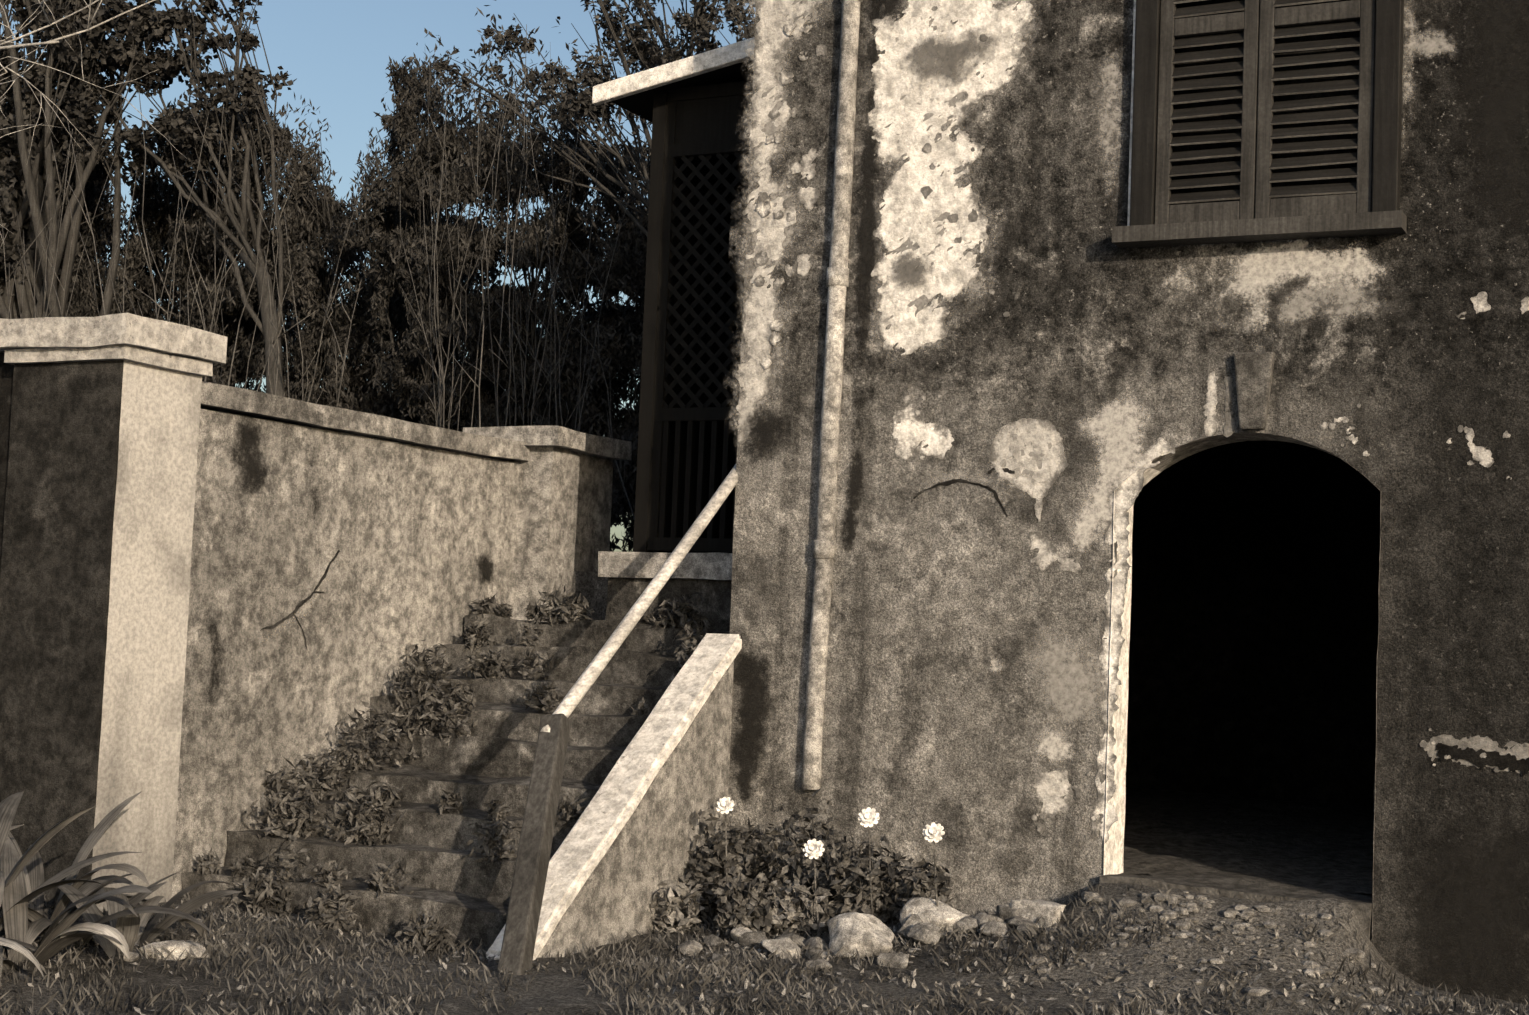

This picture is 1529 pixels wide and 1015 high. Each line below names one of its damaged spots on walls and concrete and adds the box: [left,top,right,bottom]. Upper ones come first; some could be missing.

peeling [868,0,1036,355]
damp [1099,58,1123,185]
damp [842,0,902,550]
spalling [1457,292,1491,319]
peeling [892,395,954,460]
crack [913,468,1015,517]
damp [1072,400,1144,551]
spalling [1446,425,1495,467]
crack [260,550,340,649]
peeling [989,418,1175,843]
damp [731,651,771,800]
damp [1030,634,1103,761]